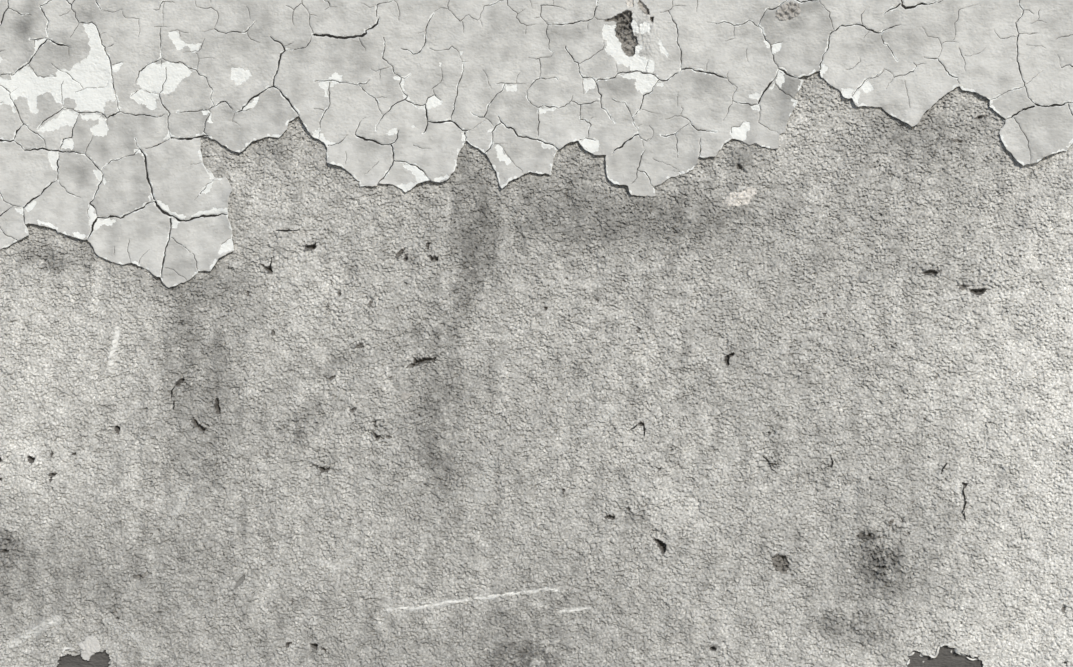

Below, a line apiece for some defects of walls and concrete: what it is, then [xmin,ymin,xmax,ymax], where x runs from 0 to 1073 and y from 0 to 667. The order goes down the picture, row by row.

peeling [0,22,559,288]
crack [0,0,1073,279]
peeling [583,78,602,100]
peeling [602,0,669,95]
peeling [573,123,705,213]
peeling [720,0,834,150]
peeling [841,59,975,127]
peeling [972,87,1073,176]
spalling [959,284,987,295]
spalling [57,636,111,667]
spalling [907,644,983,667]